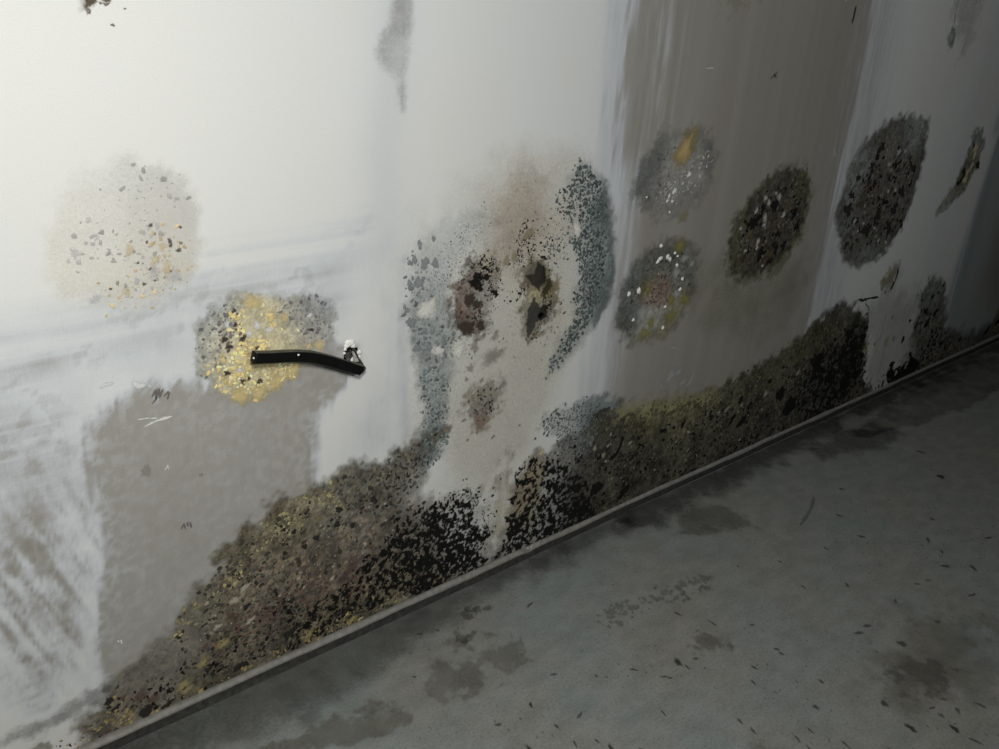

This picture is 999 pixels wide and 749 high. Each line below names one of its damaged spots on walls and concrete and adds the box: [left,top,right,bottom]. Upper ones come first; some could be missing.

damp [635,130,714,221]
damp [835,115,929,268]
damp [30,157,999,749]